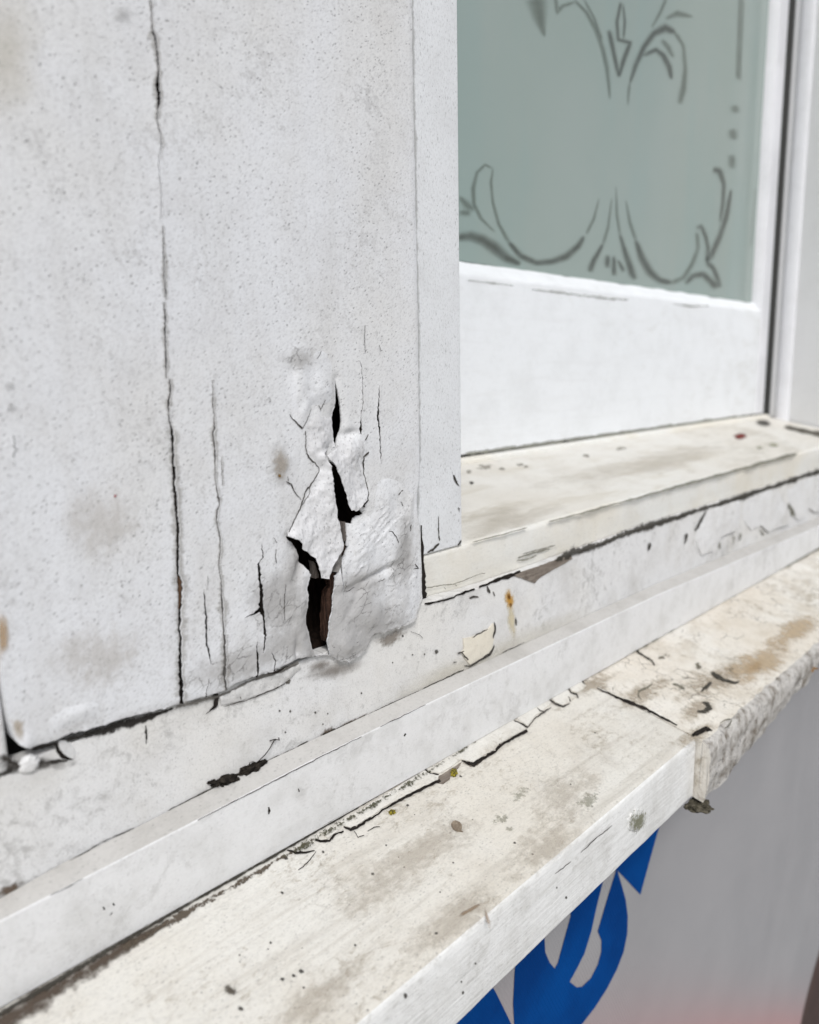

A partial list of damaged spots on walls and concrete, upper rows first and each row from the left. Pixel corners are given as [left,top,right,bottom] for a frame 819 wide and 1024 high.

crack [150,0,162,153]
crack [162,231,325,714]
peeling [695,475,819,555]
peeling [461,623,494,665]
rust [505,592,517,628]
peeling [320,682,586,839]
crack [462,650,740,767]